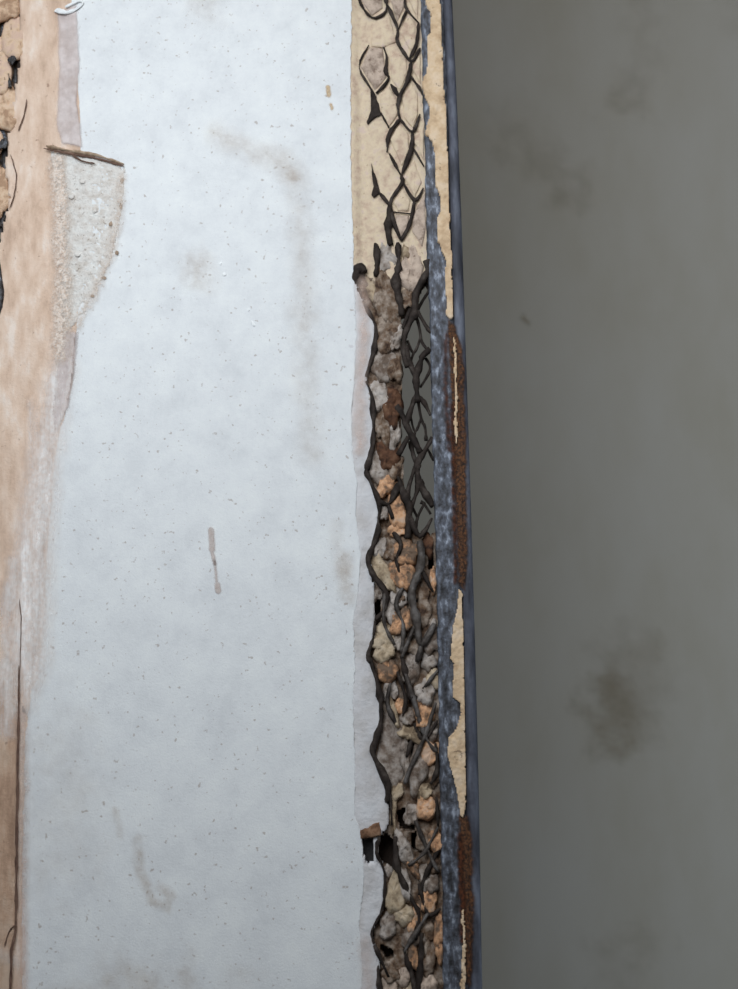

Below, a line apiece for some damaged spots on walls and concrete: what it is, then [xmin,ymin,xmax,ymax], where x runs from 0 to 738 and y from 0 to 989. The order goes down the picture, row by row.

flaking render [0,0,125,989]
flaking render [346,0,444,989]
corrosion [444,321,467,588]
corrosion [458,815,474,984]